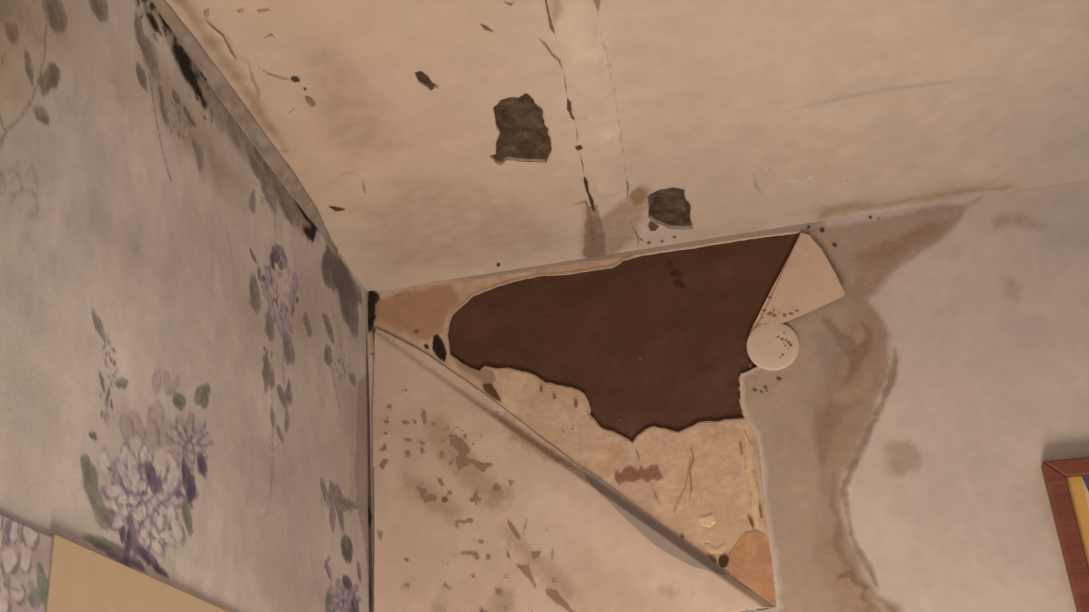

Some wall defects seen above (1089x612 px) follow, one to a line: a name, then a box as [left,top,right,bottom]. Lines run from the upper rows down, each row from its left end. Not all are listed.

water stain [137,0,317,242]
flaking render [488,93,553,165]
water stain [578,182,676,258]
flaking render [646,187,694,231]
flaking render [378,231,810,444]
water stain [497,415,576,468]
water stain [746,207,963,612]
water stain [507,552,540,587]
water stain [547,590,573,612]
water stain [707,555,729,568]